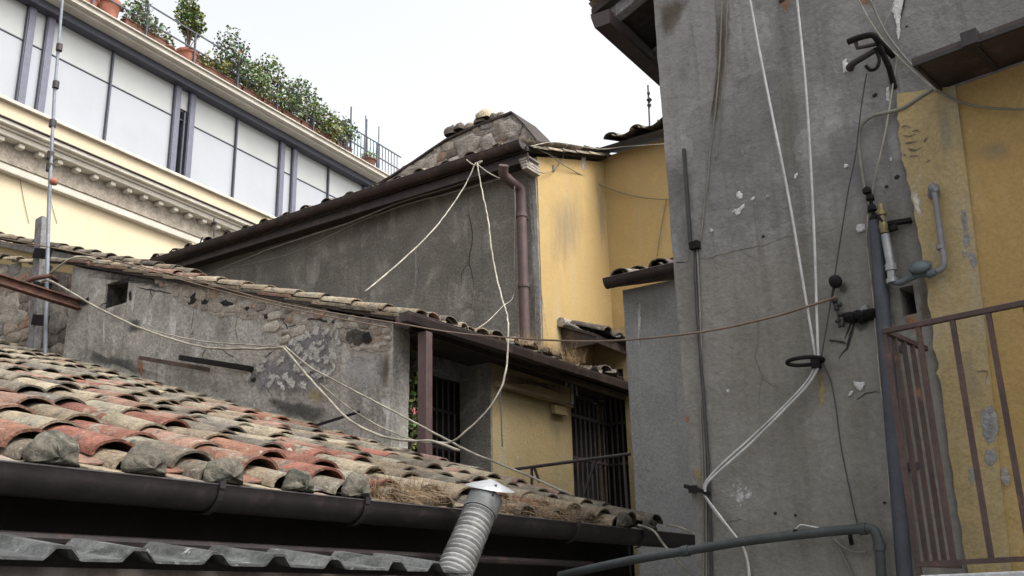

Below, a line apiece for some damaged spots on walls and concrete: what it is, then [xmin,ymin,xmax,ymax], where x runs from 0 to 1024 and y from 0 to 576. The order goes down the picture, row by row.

peeling [891,0,905,40]
peeling [732,191,755,215]
crack [461,216,474,308]
flaking render [154,279,392,399]
peeling [981,405,1011,486]